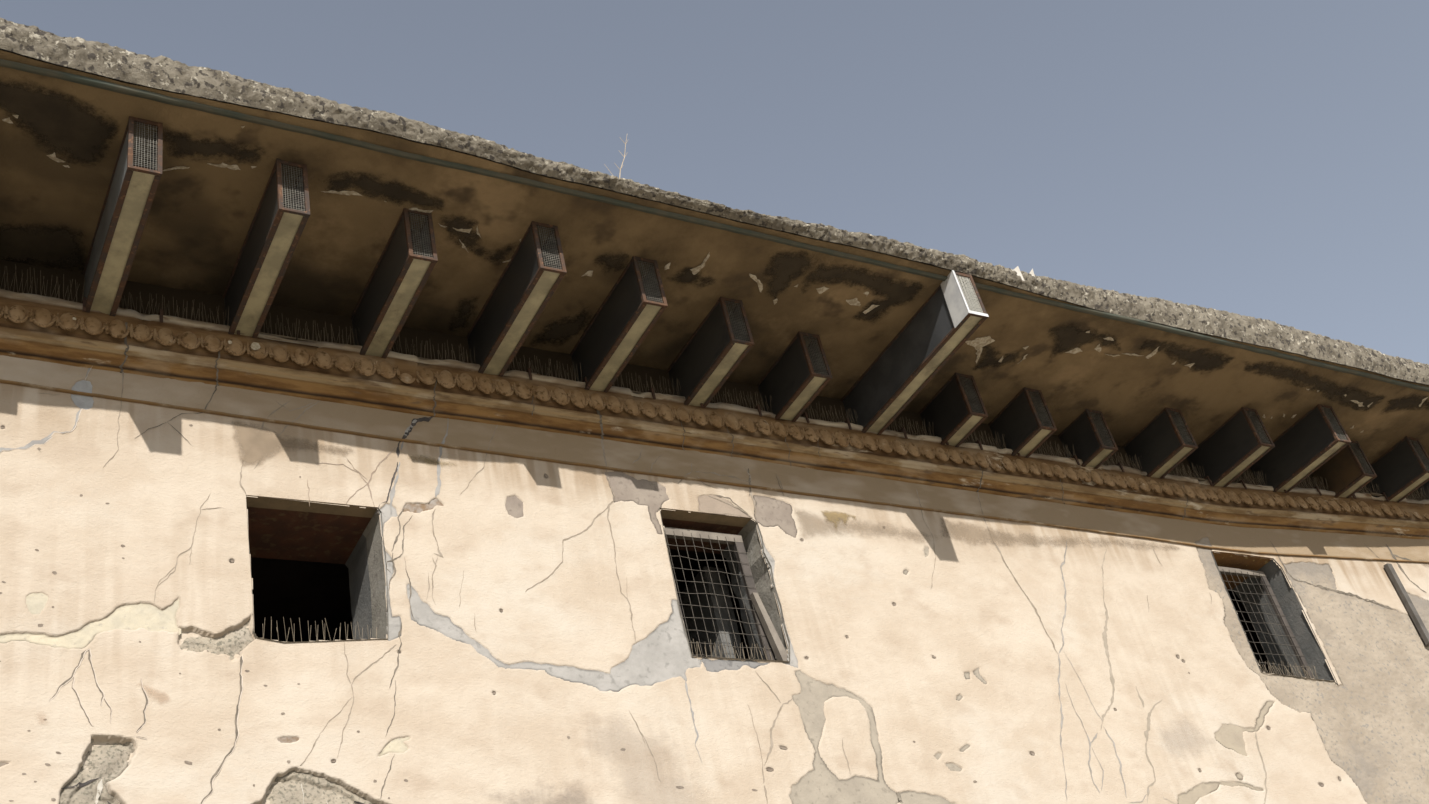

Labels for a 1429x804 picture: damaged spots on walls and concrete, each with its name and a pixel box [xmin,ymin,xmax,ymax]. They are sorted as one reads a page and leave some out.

damp [0,82,118,163]
damp [328,172,512,265]
damp [767,251,922,321]
damp [1139,340,1429,412]
crack [296,380,497,804]
crack [1270,541,1425,609]
peeling [0,598,254,672]
crack [976,465,1176,804]
crack [49,649,149,740]
crack [201,653,243,804]
peeling [51,739,135,804]
peeling [253,760,390,804]